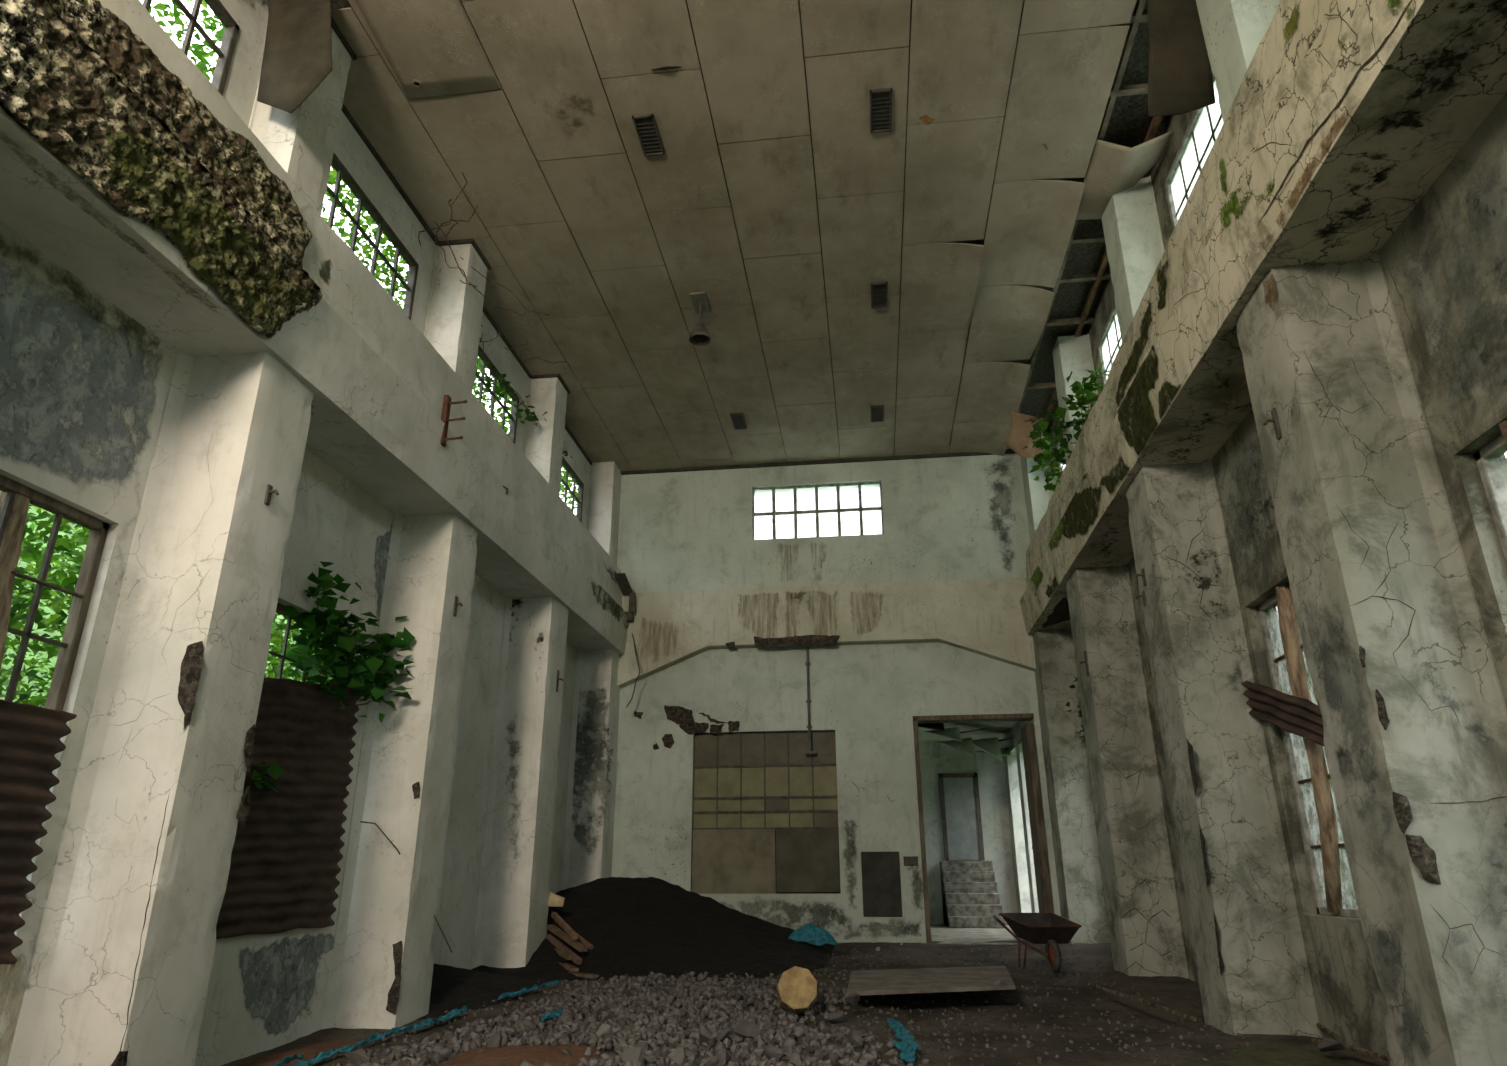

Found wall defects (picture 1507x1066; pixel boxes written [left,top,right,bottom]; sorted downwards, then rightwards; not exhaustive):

damp [1317,0,1507,246]
spalling [0,0,323,339]
crack [1304,350,1390,426]
crack [1336,504,1461,727]
spalling [178,641,204,730]
peeling [653,705,740,750]
spalling [412,782,420,799]
damp [572,688,613,854]
crack [1431,796,1507,804]
crack [1429,903,1505,975]
spalling [386,941,403,1015]